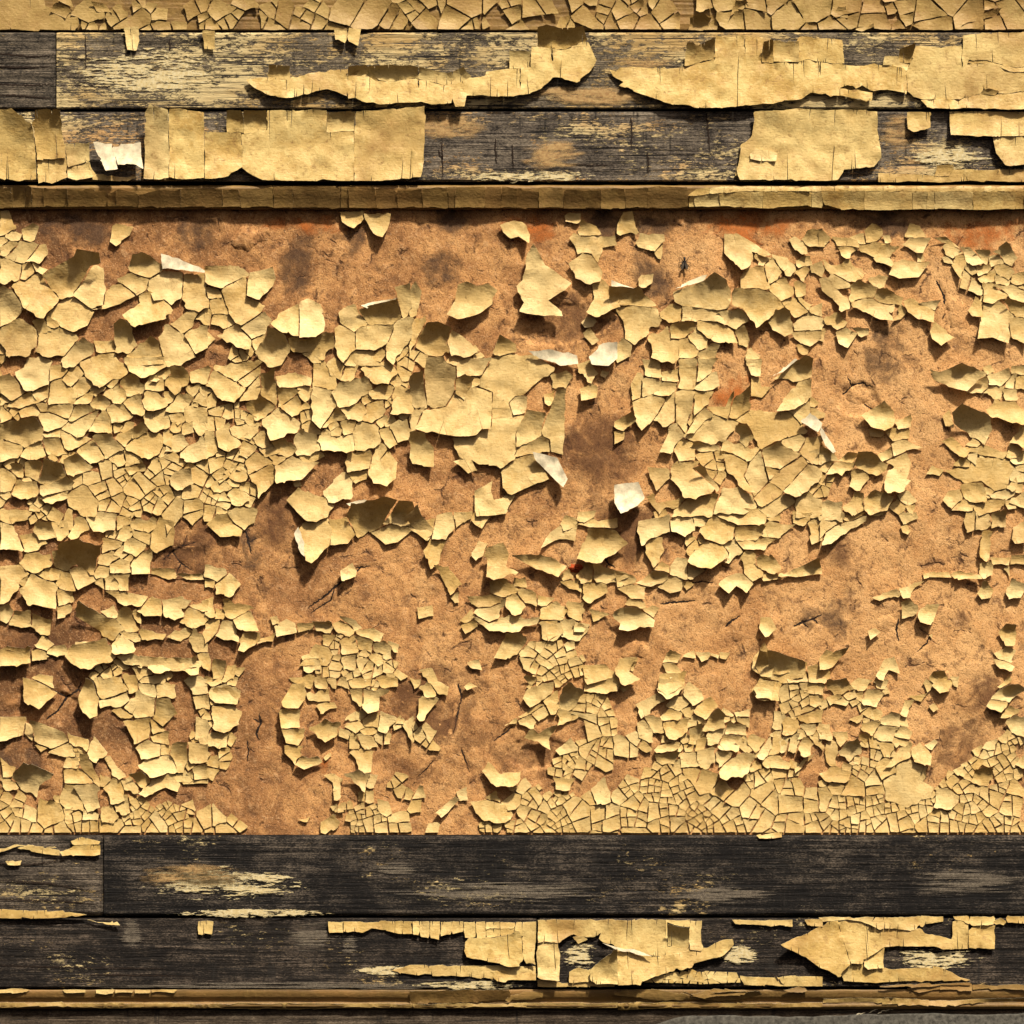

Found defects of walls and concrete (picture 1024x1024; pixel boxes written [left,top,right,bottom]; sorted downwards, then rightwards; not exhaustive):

peeling [0,0,680,184]
peeling [609,0,1024,183]
peeling [0,185,1024,839]
crack [794,614,822,627]
crack [895,618,930,651]
crack [46,682,82,719]
crack [247,713,262,761]
crack [453,684,470,772]
peeling [0,916,1024,1010]